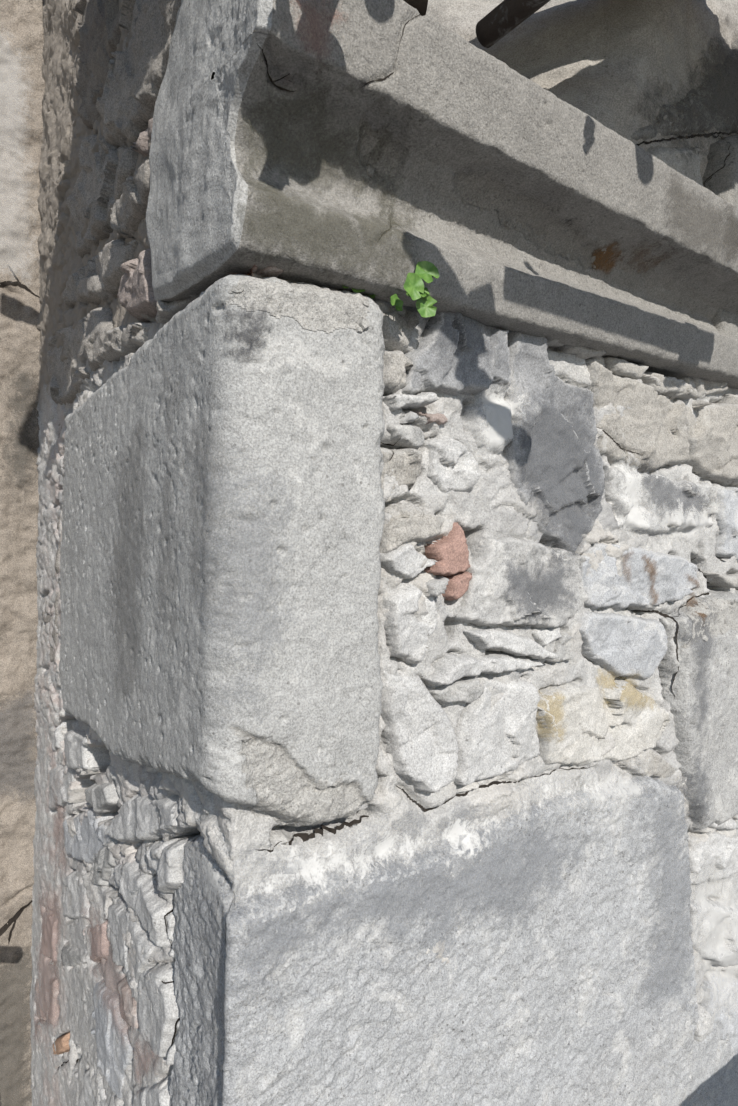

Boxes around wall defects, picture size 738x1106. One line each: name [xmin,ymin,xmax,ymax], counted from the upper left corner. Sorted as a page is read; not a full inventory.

crack [257,44,295,92]
crack [361,14,421,88]
leakage [639,23,738,149]
crack [636,130,735,187]
rust [592,242,622,273]
crack [631,557,710,696]
crack [255,815,369,853]
crack [171,1018,180,1046]